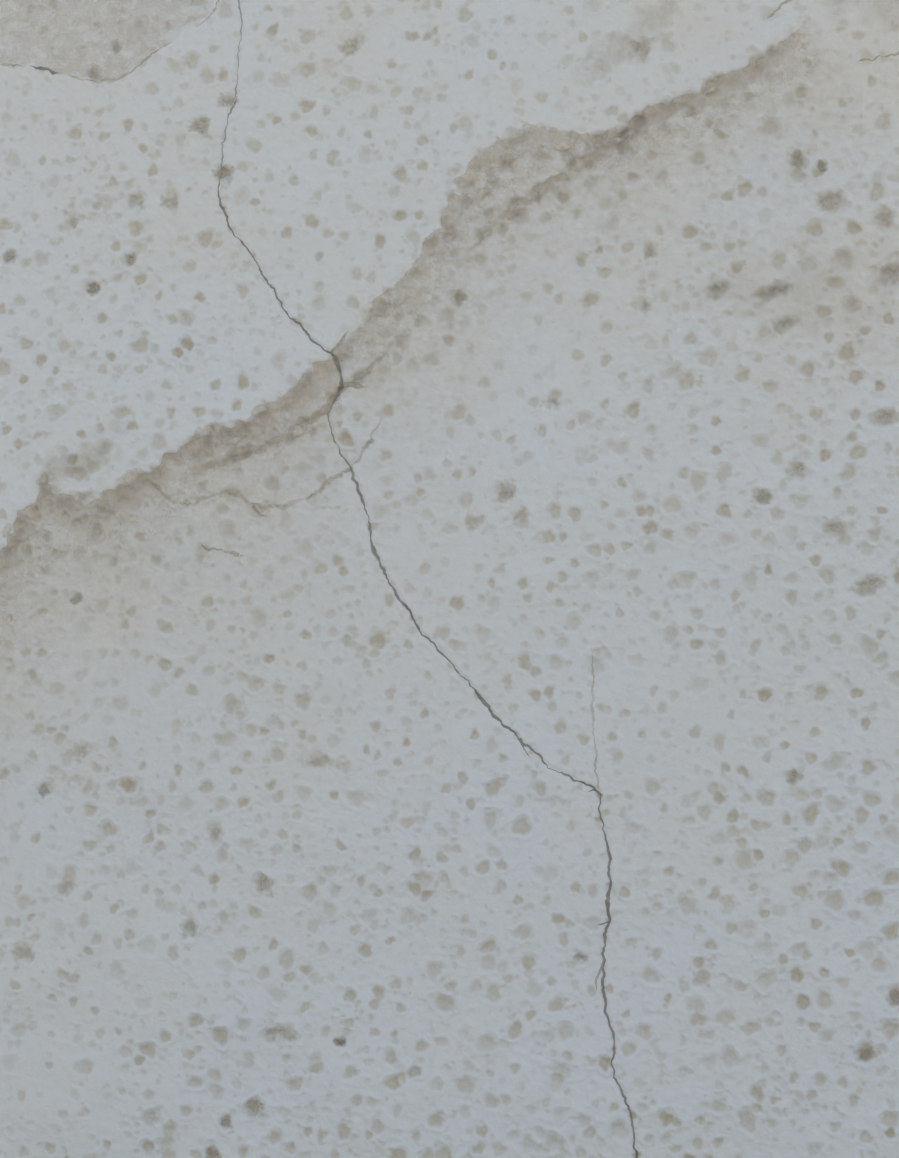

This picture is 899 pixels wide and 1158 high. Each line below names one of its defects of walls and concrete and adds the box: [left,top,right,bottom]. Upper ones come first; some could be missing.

flaking render [368,32,803,339]
flaking render [0,342,372,600]
crack [218,177,638,1158]